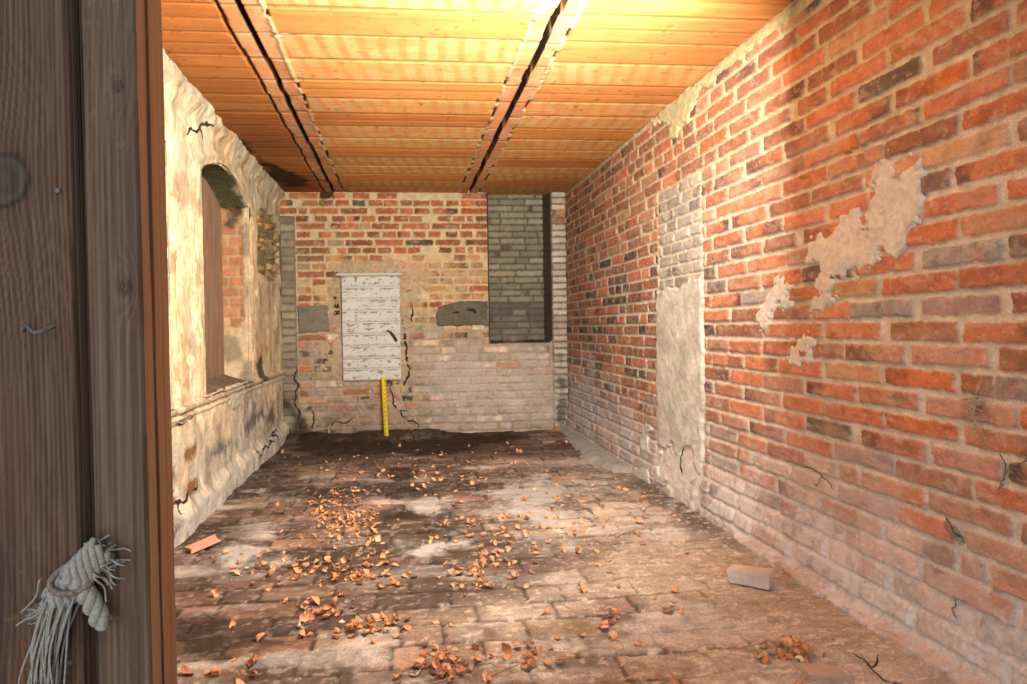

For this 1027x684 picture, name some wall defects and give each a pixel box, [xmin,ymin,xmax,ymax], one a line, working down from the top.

crack [187,121,214,138]
crack [255,367,353,457]
crack [375,304,420,431]
crack [173,480,199,515]